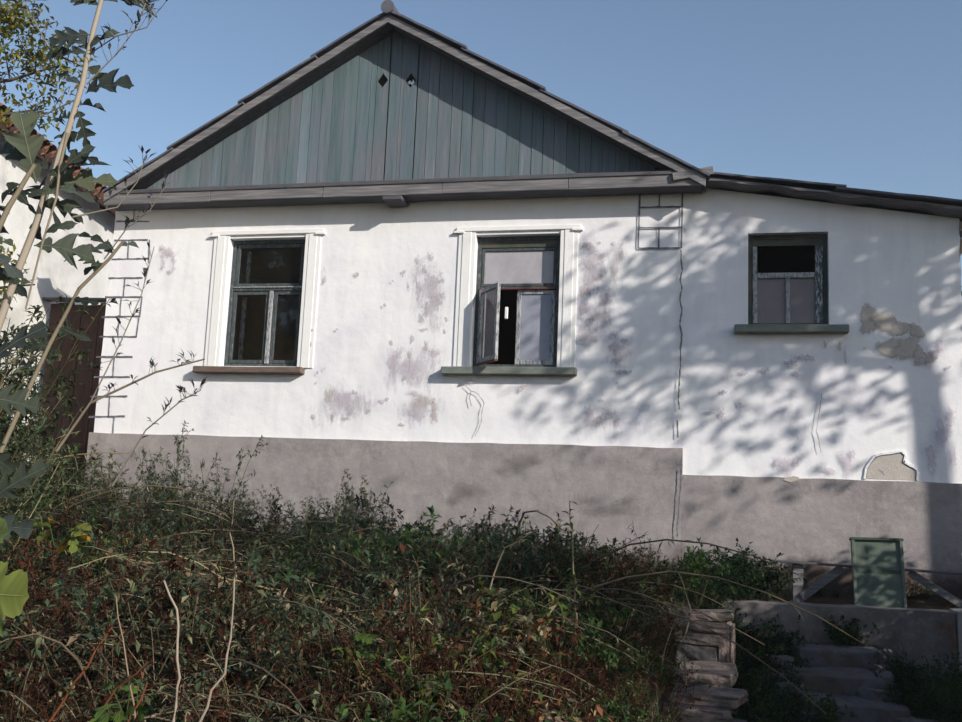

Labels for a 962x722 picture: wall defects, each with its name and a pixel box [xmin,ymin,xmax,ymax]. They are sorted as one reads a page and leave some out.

peeling [392,255,447,343]
peeling [578,241,623,340]
crack [675,250,683,438]
crack [465,385,484,436]
crack [675,468,683,537]
spalling [863,450,919,481]